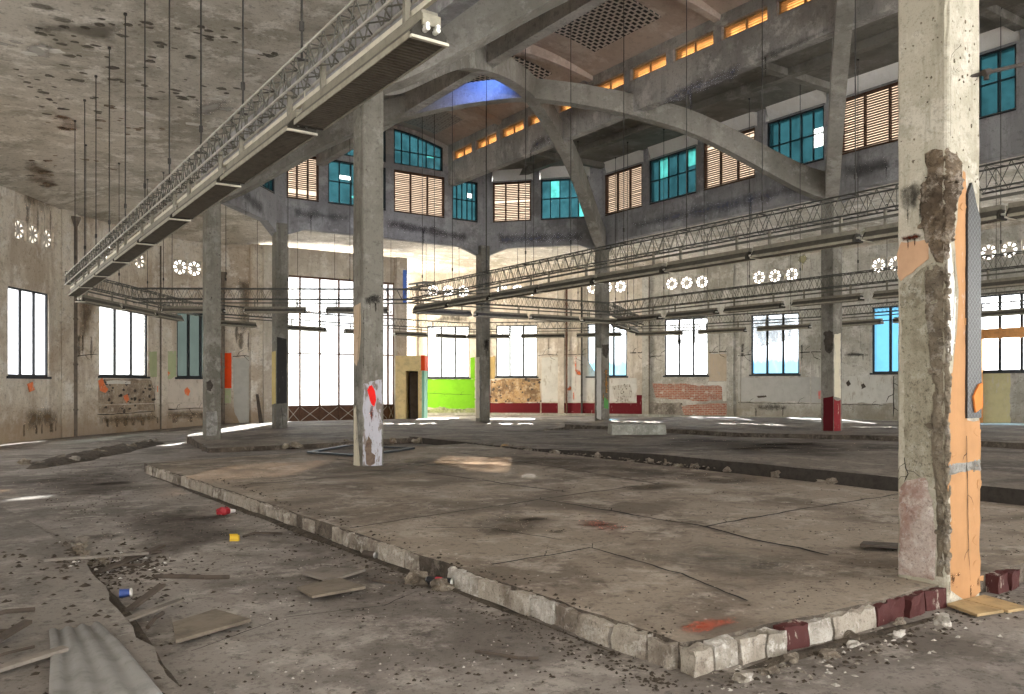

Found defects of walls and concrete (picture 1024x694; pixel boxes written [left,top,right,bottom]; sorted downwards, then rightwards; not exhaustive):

water stain [32,4,112,38]
water stain [27,163,57,187]
peeling [823,137,1011,599]
peeling [354,379,382,466]